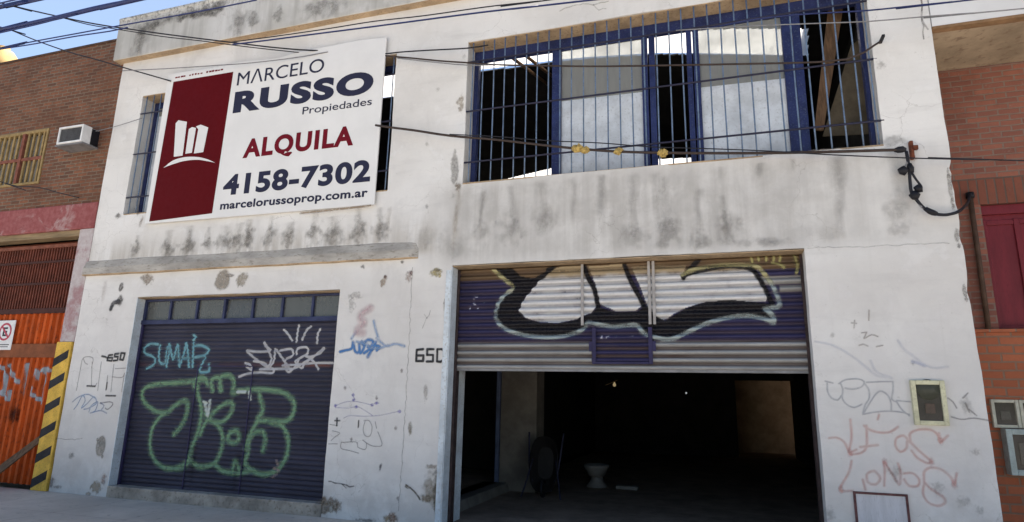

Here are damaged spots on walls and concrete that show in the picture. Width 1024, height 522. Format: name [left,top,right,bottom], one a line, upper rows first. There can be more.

water stain [141,3,222,33]
flaking render [215,270,248,289]